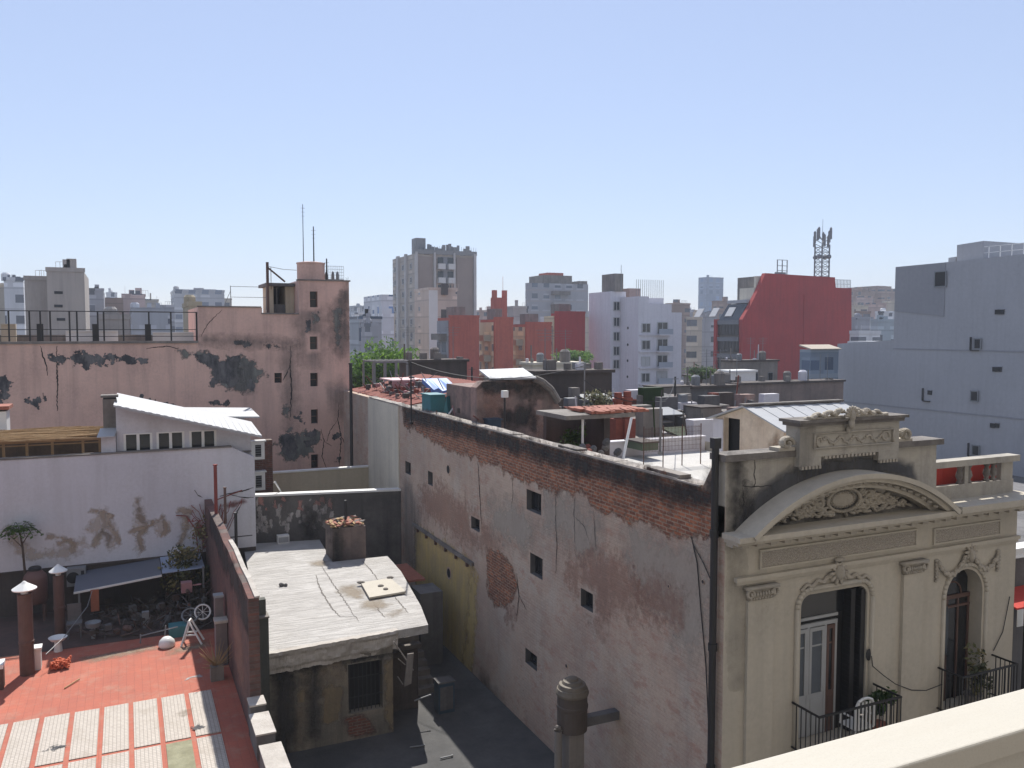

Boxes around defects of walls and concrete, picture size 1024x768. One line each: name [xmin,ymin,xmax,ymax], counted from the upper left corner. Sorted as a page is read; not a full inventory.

peeling [0,375,14,404]
peeling [24,393,47,410]
crack [40,346,58,411]
peeling [47,349,148,371]
peeling [193,340,269,407]
crack [283,346,293,417]
peeling [272,404,342,461]
flaking render [403,408,711,540]
crack [555,497,596,559]
crack [316,561,407,621]
spalling [486,549,517,607]